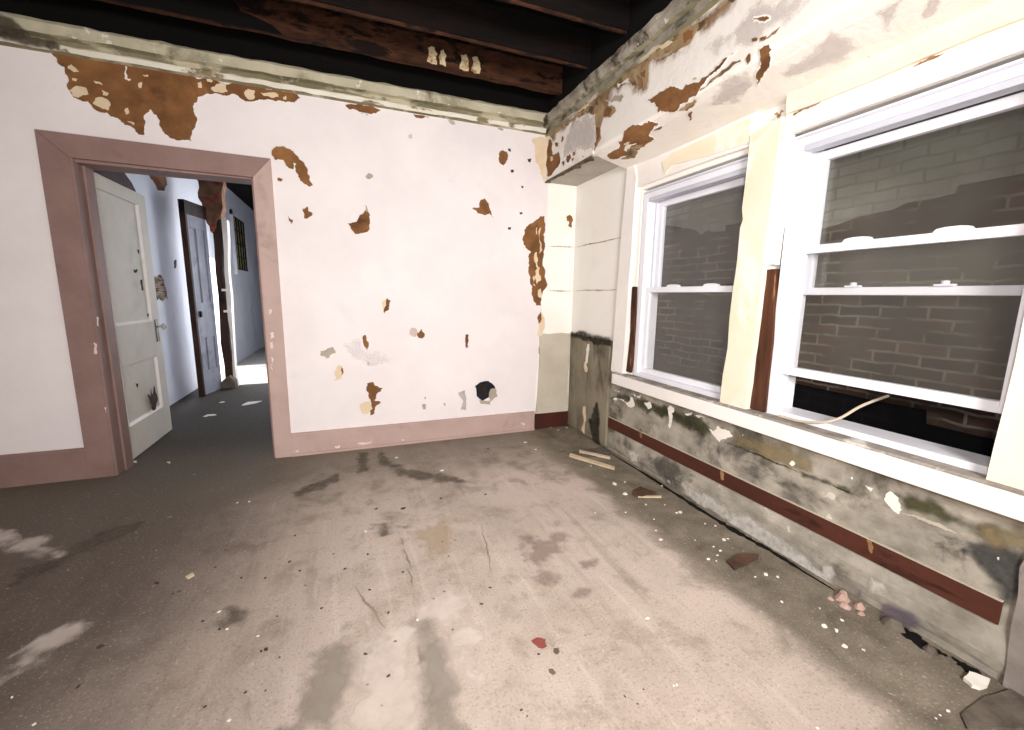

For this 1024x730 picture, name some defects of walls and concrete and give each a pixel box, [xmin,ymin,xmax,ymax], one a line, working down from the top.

peeling [50,53,302,142]
peeling [527,0,773,181]
peeling [270,145,313,188]
peeling [347,206,371,235]
peeling [519,212,548,336]
leakage [571,331,611,345]
peeling [360,381,384,416]
leakage [589,403,600,445]
leakage [617,396,709,435]
leakage [904,497,958,522]
leakage [668,480,833,583]
leakage [963,526,1024,602]